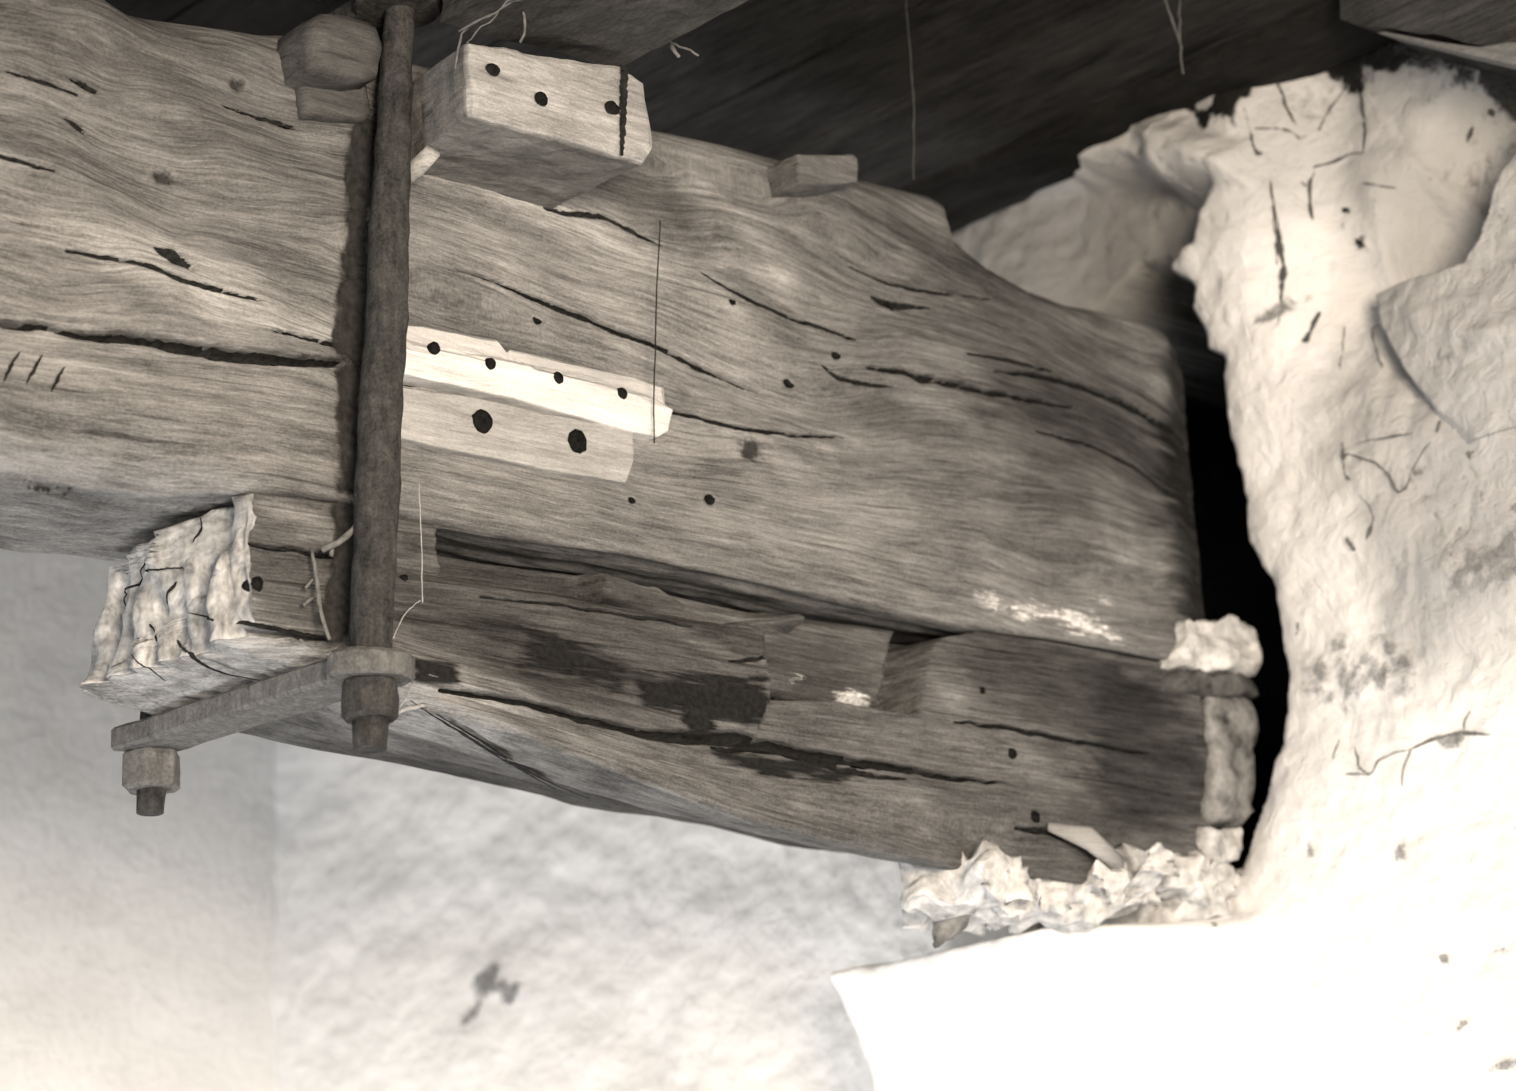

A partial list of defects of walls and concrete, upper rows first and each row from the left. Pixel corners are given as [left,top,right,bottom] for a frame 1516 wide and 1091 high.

crack [6,71,97,135]
crack [223,106,294,130]
crack [0,247,340,368]
crack [456,270,751,392]
crack [672,412,843,439]
crack [701,266,1182,495]
water stain [516,628,853,784]
crack [410,689,998,799]
crack [728,655,763,663]
crack [953,722,1144,754]